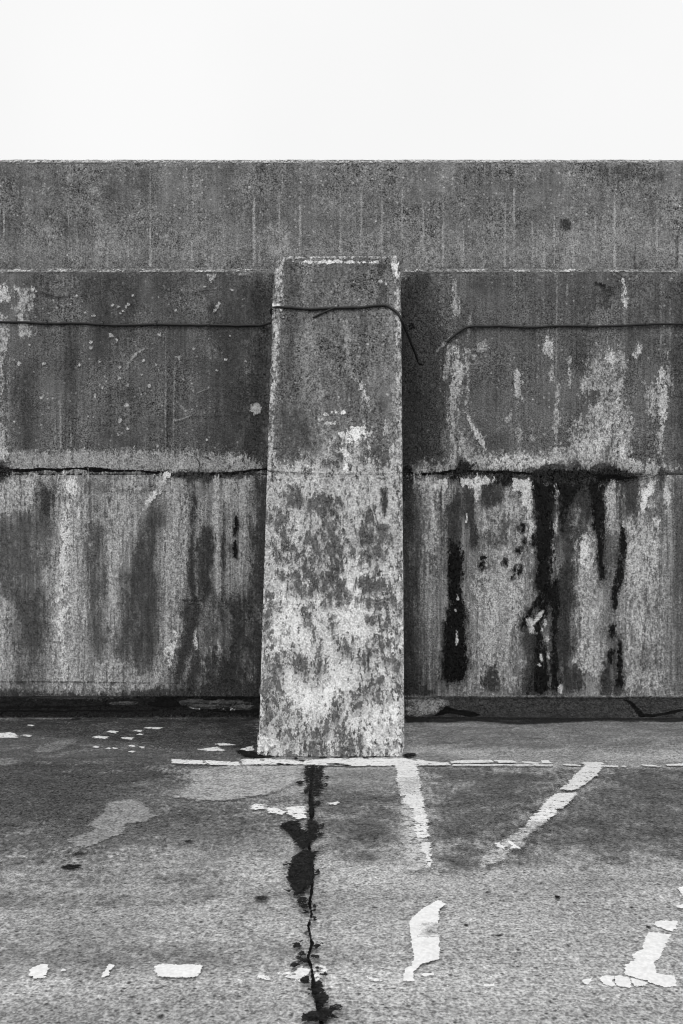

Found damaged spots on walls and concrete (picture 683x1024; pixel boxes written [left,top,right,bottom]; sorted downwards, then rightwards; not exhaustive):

crack [260,755,392,1024]
damp [0,162,683,903]